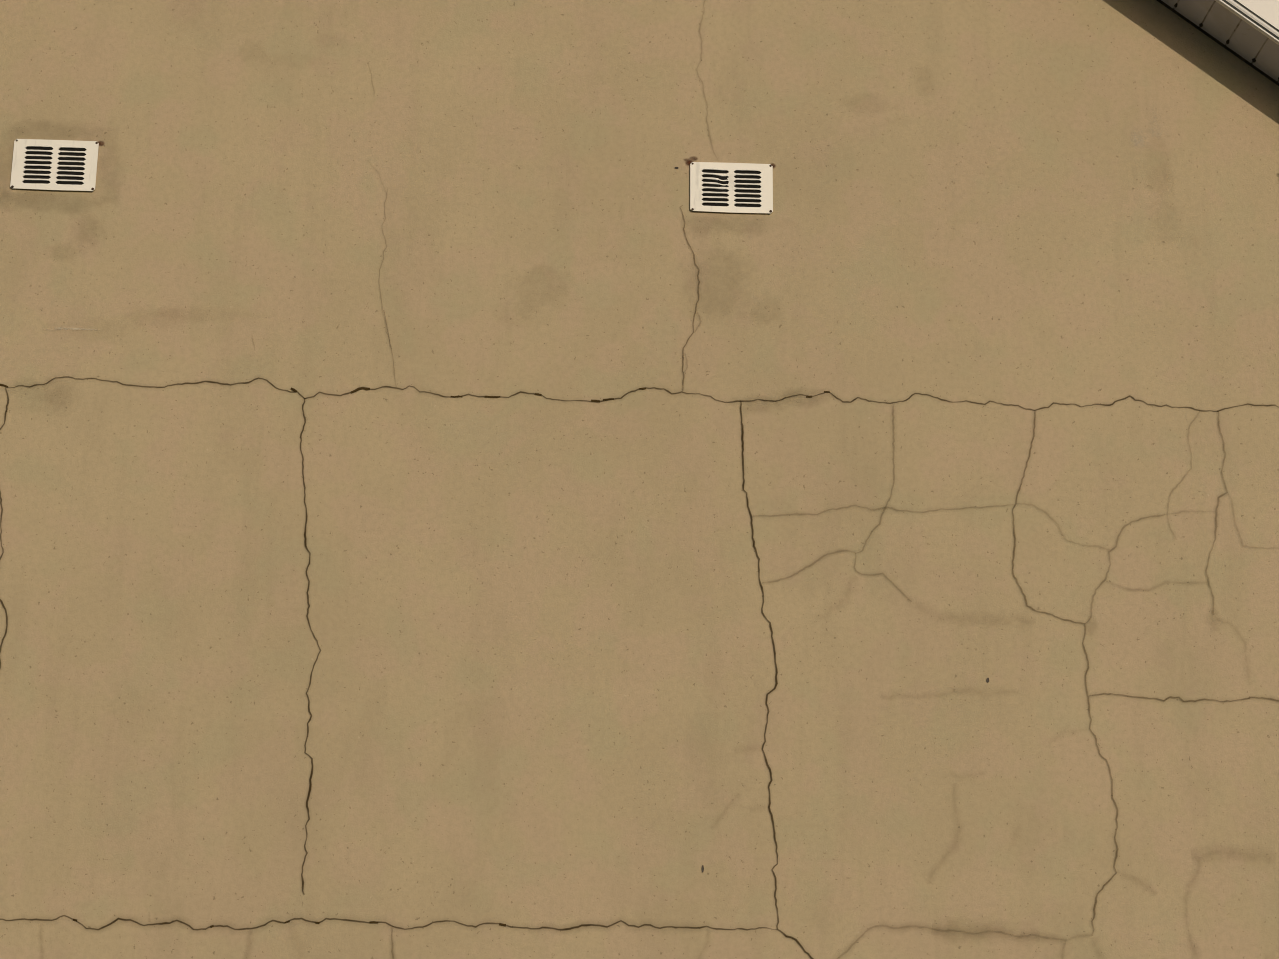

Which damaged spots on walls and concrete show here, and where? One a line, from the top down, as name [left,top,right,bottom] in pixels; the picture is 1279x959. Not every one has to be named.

crack [0,228,1273,959]